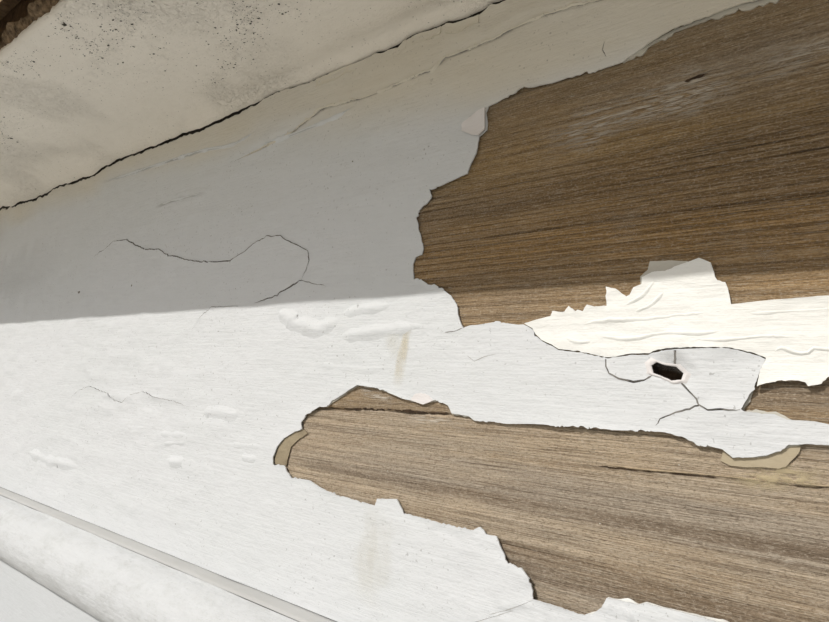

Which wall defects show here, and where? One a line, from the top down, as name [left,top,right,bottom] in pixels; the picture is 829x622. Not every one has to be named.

damp [48,1,148,69]
damp [213,1,270,83]
crack [0,0,505,210]
peeling [414,0,829,424]
crack [99,235,322,303]
crack [605,359,652,382]
crack [655,383,740,426]
peeling [274,385,829,622]